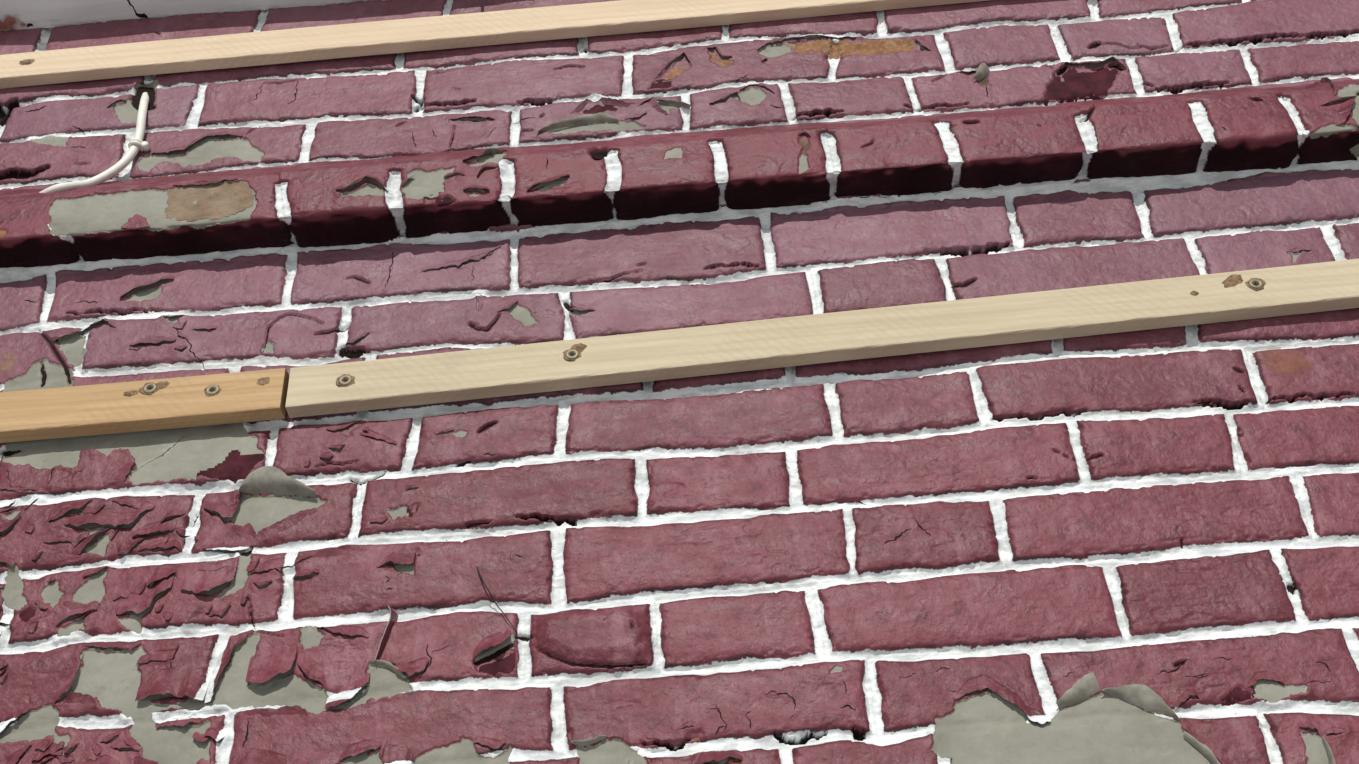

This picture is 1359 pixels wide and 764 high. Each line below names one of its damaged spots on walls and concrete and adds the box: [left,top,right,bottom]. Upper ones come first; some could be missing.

crack [127,0,159,35]
peeling [514,52,692,134]
peeling [1044,57,1126,106]
peeling [50,132,264,236]
peeling [335,148,507,207]
crack [25,300,71,387]
crack [3,449,21,457]
peeling [0,416,449,764]
peeling [338,736,511,764]
peeling [677,721,742,764]
peeling [932,672,1221,764]
peeling [1220,672,1305,706]